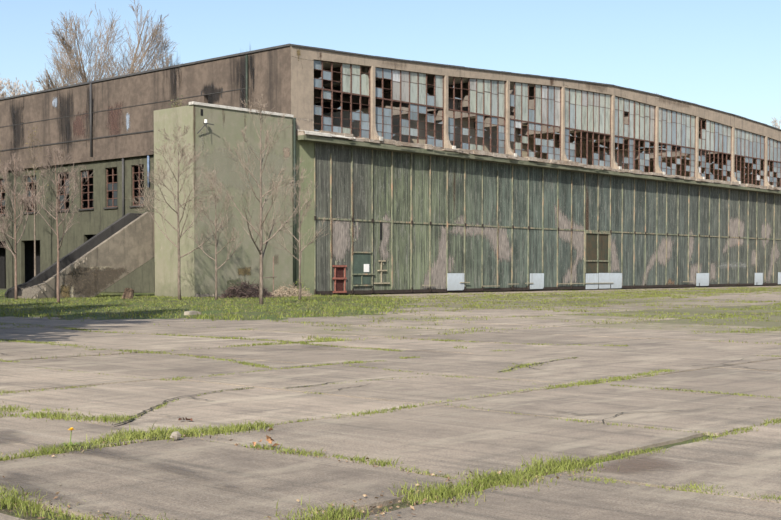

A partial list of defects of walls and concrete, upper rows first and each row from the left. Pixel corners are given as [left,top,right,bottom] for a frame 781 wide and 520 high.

damp [10,104,23,150]
damp [52,93,73,151]
peeling [328,216,361,265]
peeling [421,215,514,293]
peeling [554,204,584,286]
peeling [641,235,674,285]
peeling [687,228,702,285]
peeling [717,216,780,283]